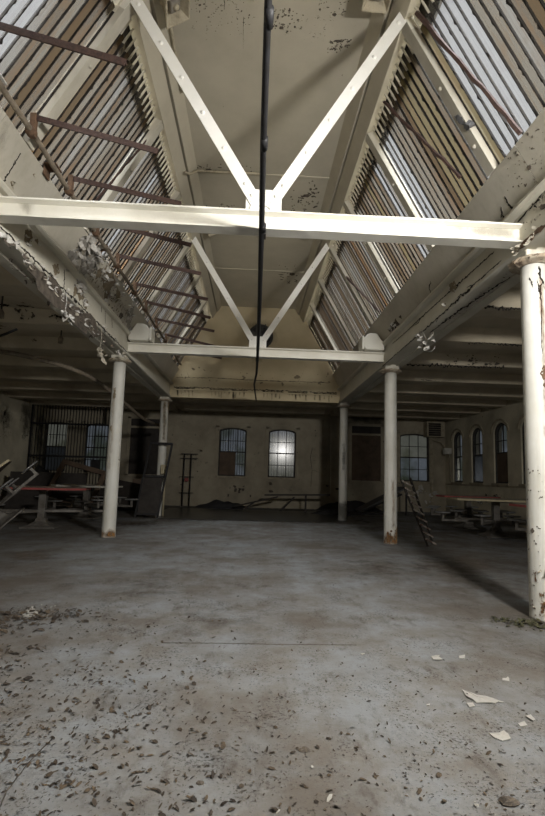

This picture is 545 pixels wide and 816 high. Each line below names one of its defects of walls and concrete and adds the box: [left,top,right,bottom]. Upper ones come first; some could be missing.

peeling [313,1,352,53]
peeling [510,193,545,256]
peeling [0,229,137,364]
peeling [415,329,435,352]
peeling [530,565,545,616]
crack [0,739,52,807]